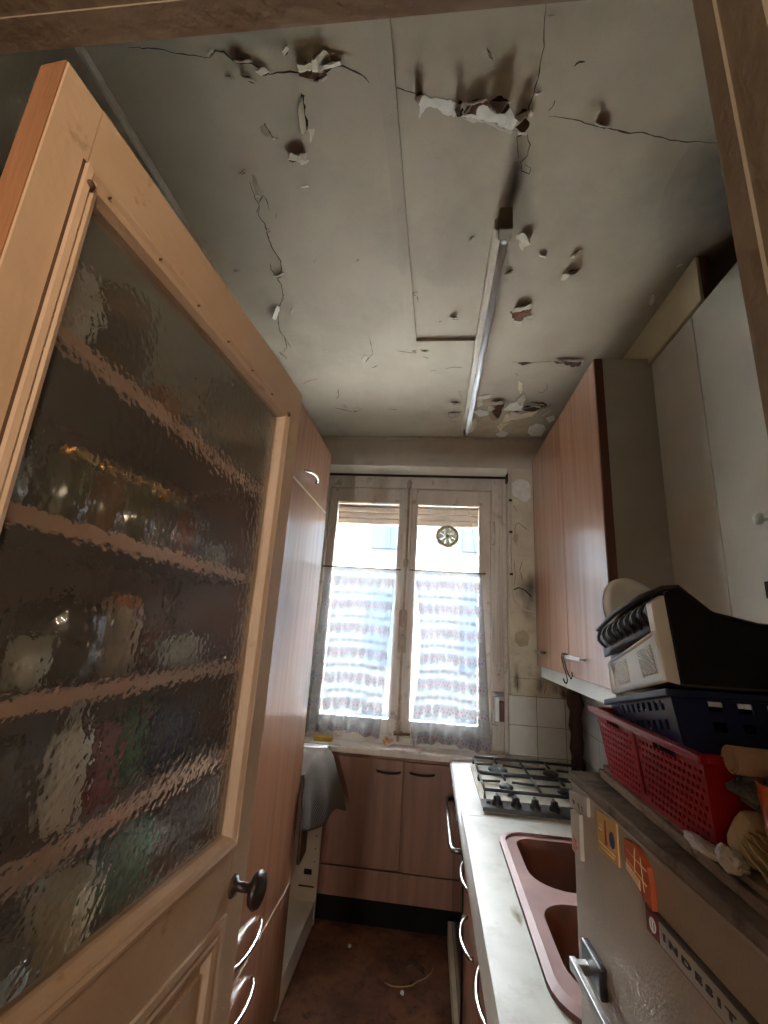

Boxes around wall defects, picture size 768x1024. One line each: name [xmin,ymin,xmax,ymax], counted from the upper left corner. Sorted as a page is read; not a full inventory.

peeling [128,47,369,85]
peeling [288,97,315,165]
peeling [396,87,530,134]
crack [517,10,714,174]
crack [239,170,294,359]
peeling [516,233,531,251]
peeling [561,249,583,280]
flaking render [510,304,534,321]
peeling [448,382,555,437]